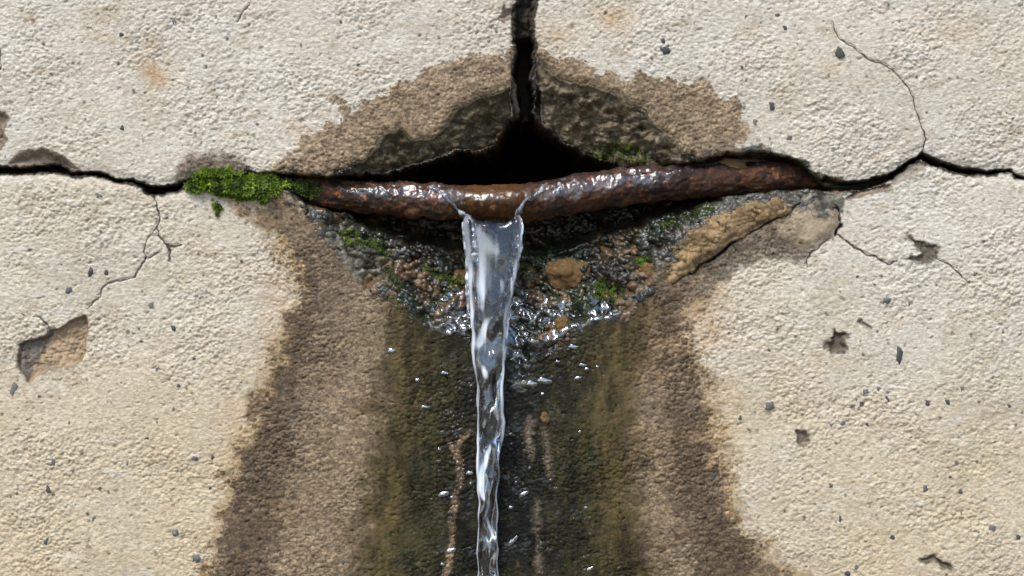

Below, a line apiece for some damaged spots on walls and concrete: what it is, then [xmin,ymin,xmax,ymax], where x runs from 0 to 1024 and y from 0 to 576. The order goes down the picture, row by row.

damp [272,46,515,177]
crack [510,0,542,123]
damp [534,48,755,160]
crack [821,23,1024,193]
crack [0,163,192,309]
spalling [243,54,927,393]
crack [806,224,898,268]
spalling [904,234,941,264]
spalling [10,315,88,396]
damp [200,194,405,576]
damp [620,246,798,576]
spalling [796,429,811,446]